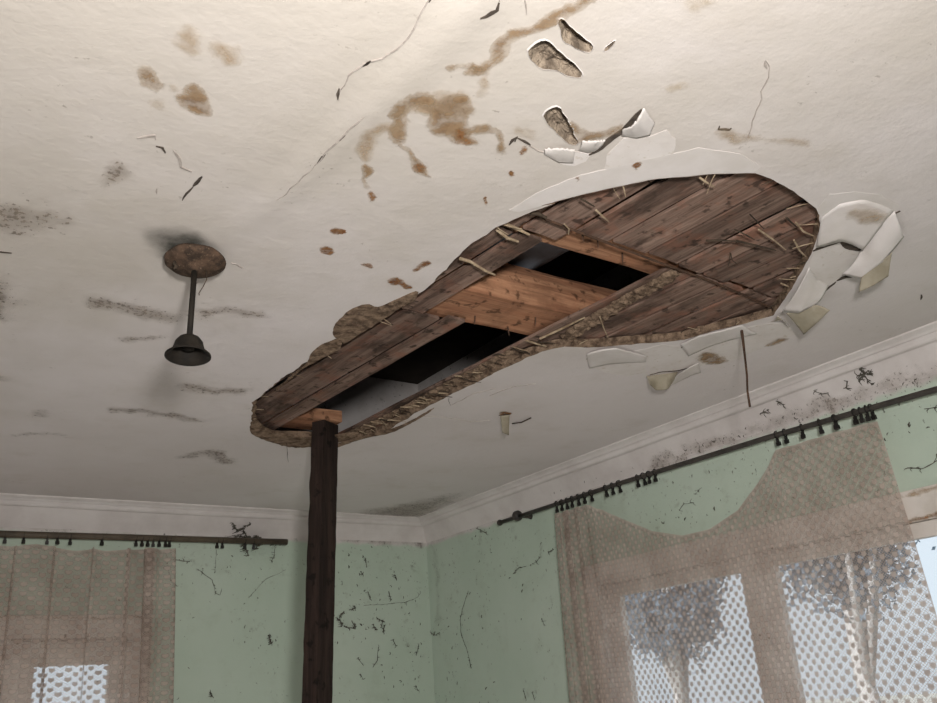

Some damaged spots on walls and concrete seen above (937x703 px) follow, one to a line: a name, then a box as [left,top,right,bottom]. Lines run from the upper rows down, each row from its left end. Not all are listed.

crack [336,0,431,100]
leakage [467,0,588,74]
spalling [527,17,616,78]
crack [277,117,364,200]
leakage [360,96,504,177]
peeling [510,105,762,218]
crack [718,61,770,137]
leakage [0,200,72,235]
peeling [351,192,904,439]
spalling [251,362,312,436]